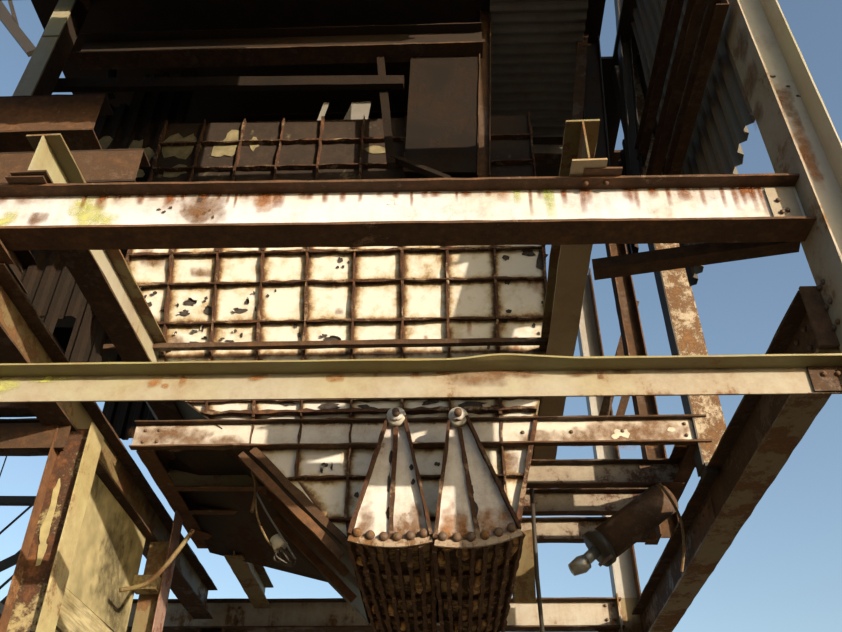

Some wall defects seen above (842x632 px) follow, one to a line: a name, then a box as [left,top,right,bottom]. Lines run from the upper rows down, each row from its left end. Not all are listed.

peeling [128,133,197,178]
peeling [211,130,241,157]
peeling [364,145,385,154]
corrosion [776,90,820,178]
corrosion [138,194,186,204]
corrosion [256,193,283,207]
corrosion [719,186,763,200]
peeling [522,250,549,270]
peeling [176,296,212,316]
peeling [232,291,257,313]
corrosion [456,370,531,384]
corrosion [441,515,467,540]